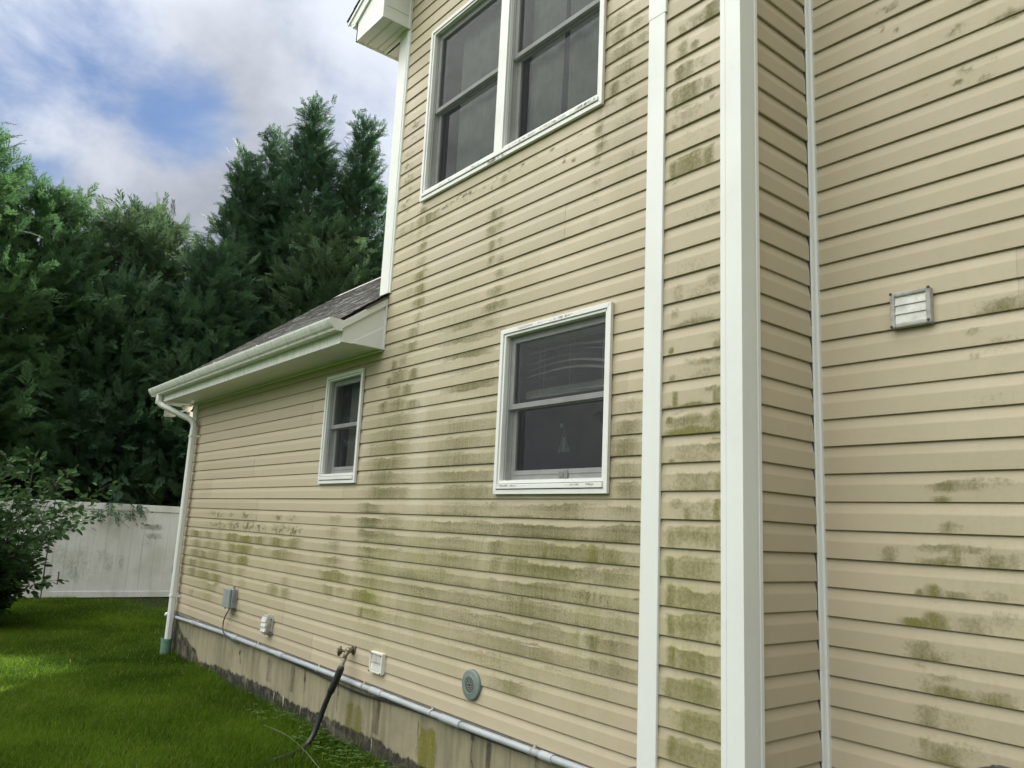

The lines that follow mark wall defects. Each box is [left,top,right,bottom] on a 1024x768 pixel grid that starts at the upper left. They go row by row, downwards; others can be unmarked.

leakage [453,380,488,392]
leakage [667,393,718,435]
leakage [217,514,296,565]
leakage [362,483,391,562]
leakage [511,516,573,593]
leakage [904,613,945,630]